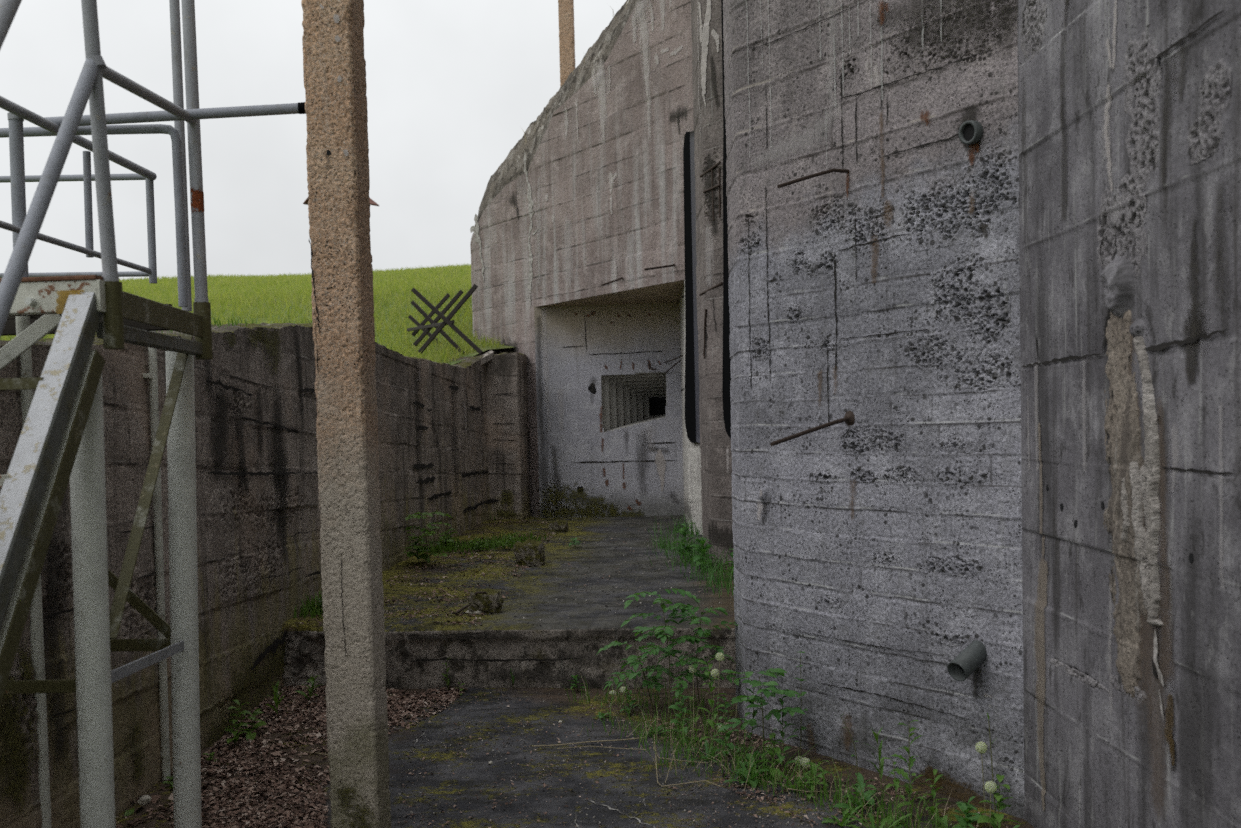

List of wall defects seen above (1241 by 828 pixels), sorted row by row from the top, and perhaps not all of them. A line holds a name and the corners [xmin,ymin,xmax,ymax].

crack [1154,11,1223,59]
leakage [1183,221,1205,384]
corrosion [770,417,849,446]
peeling [1050,310,1165,703]
crack [1022,310,1233,477]